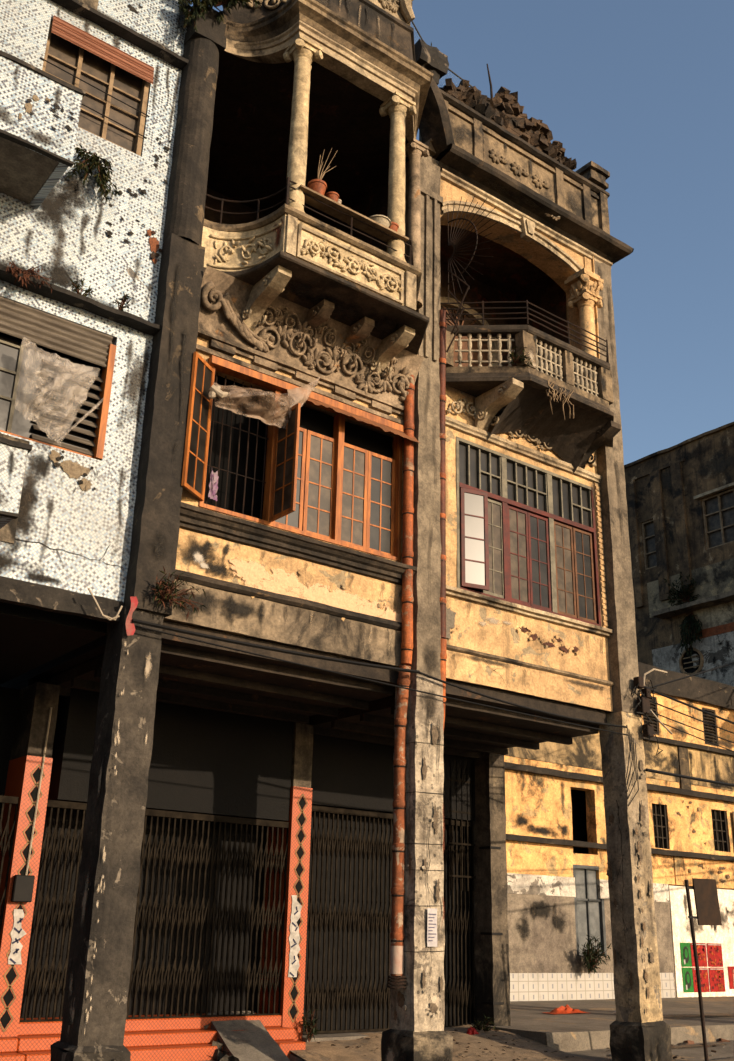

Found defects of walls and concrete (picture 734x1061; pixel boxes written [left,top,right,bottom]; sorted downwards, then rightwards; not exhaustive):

spalling [49,450,96,491]
damp [182,539,233,578]
damp [176,590,287,622]
peeling [517,625,580,655]
spalling [98,722,120,793]
spalling [80,875,105,922]
mould [518,901,566,939]
spalling [68,976,93,1035]
spalling [422,972,443,1017]